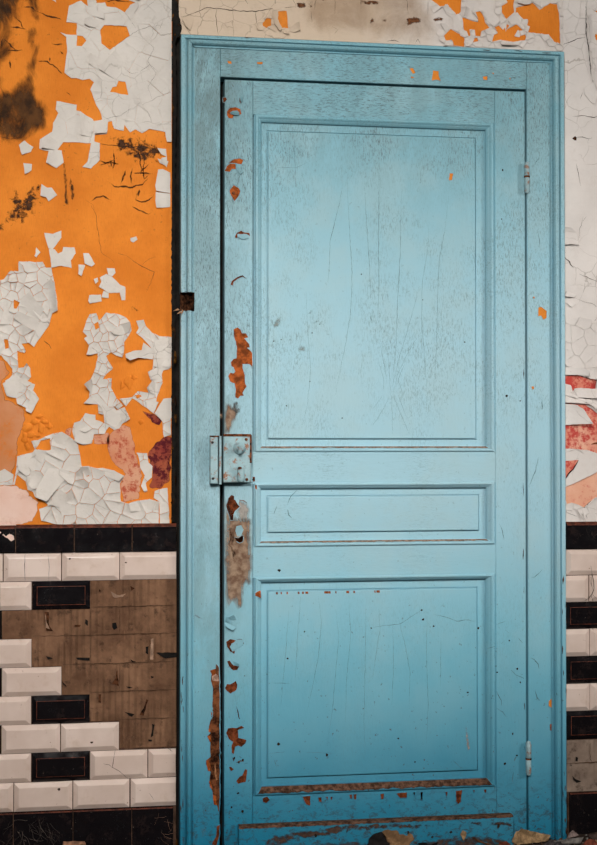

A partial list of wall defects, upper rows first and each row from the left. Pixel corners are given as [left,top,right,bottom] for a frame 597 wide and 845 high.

damp [0,0,18,59]
damp [0,50,45,139]
peeling [19,0,172,208]
peeling [256,4,300,35]
peeling [0,231,172,541]
peeling [228,326,253,399]
crack [328,183,447,433]
peeling [565,316,597,519]
peeling [225,494,240,521]
peeling [2,579,176,748]
peeling [205,639,248,813]
peeling [445,789,463,804]